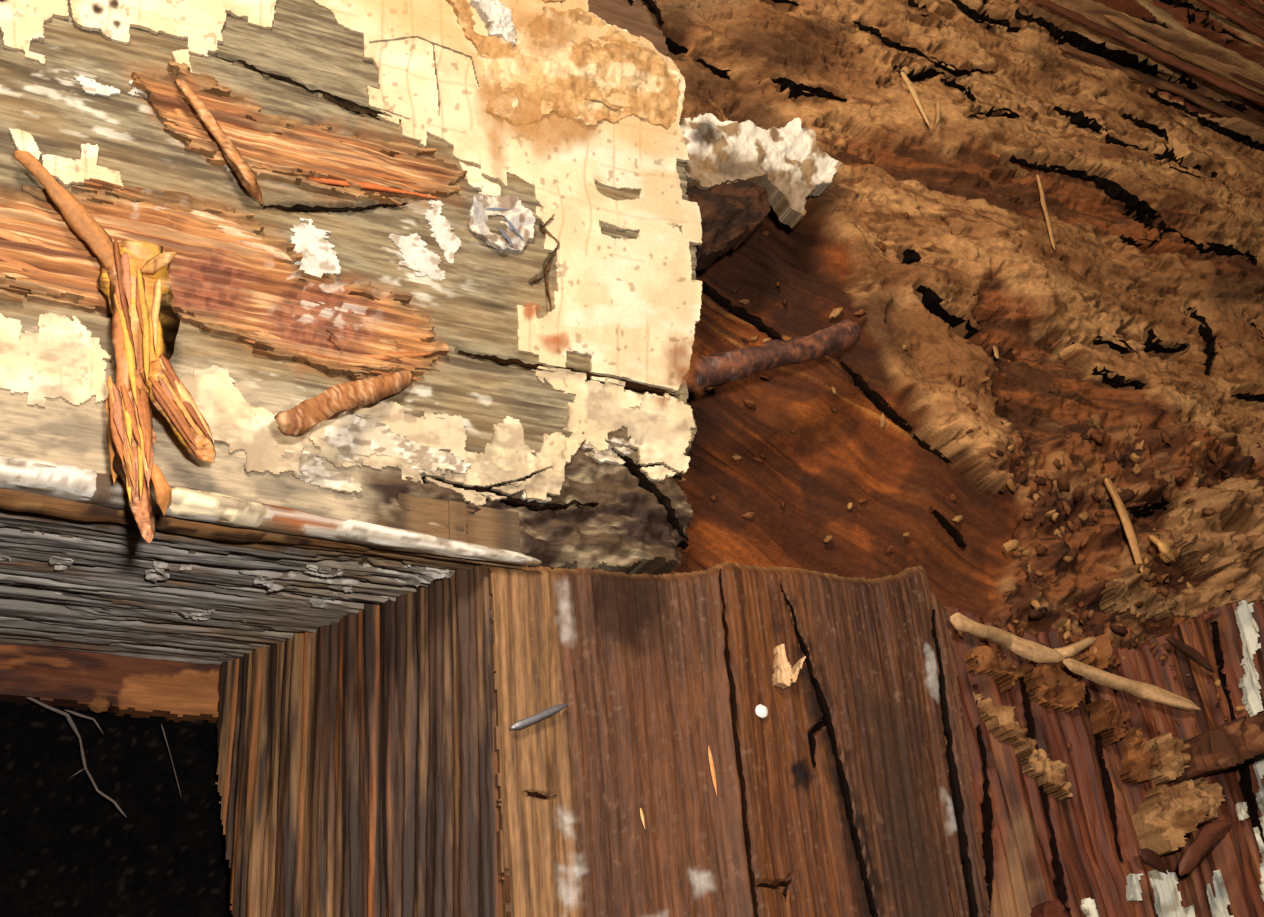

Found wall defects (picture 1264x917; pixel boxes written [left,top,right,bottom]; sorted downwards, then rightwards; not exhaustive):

peeling [0,0,278,73]
crack [853,21,1022,119]
crack [908,0,1264,187]
peeling [0,289,111,408]
peeling [9,128,124,194]
peeling [180,0,702,506]
crack [902,249,987,340]
crack [1009,155,1264,269]
crack [1071,306,1218,389]
peeling [342,519,534,563]
peeling [1235,600,1264,737]
crack [719,569,792,917]